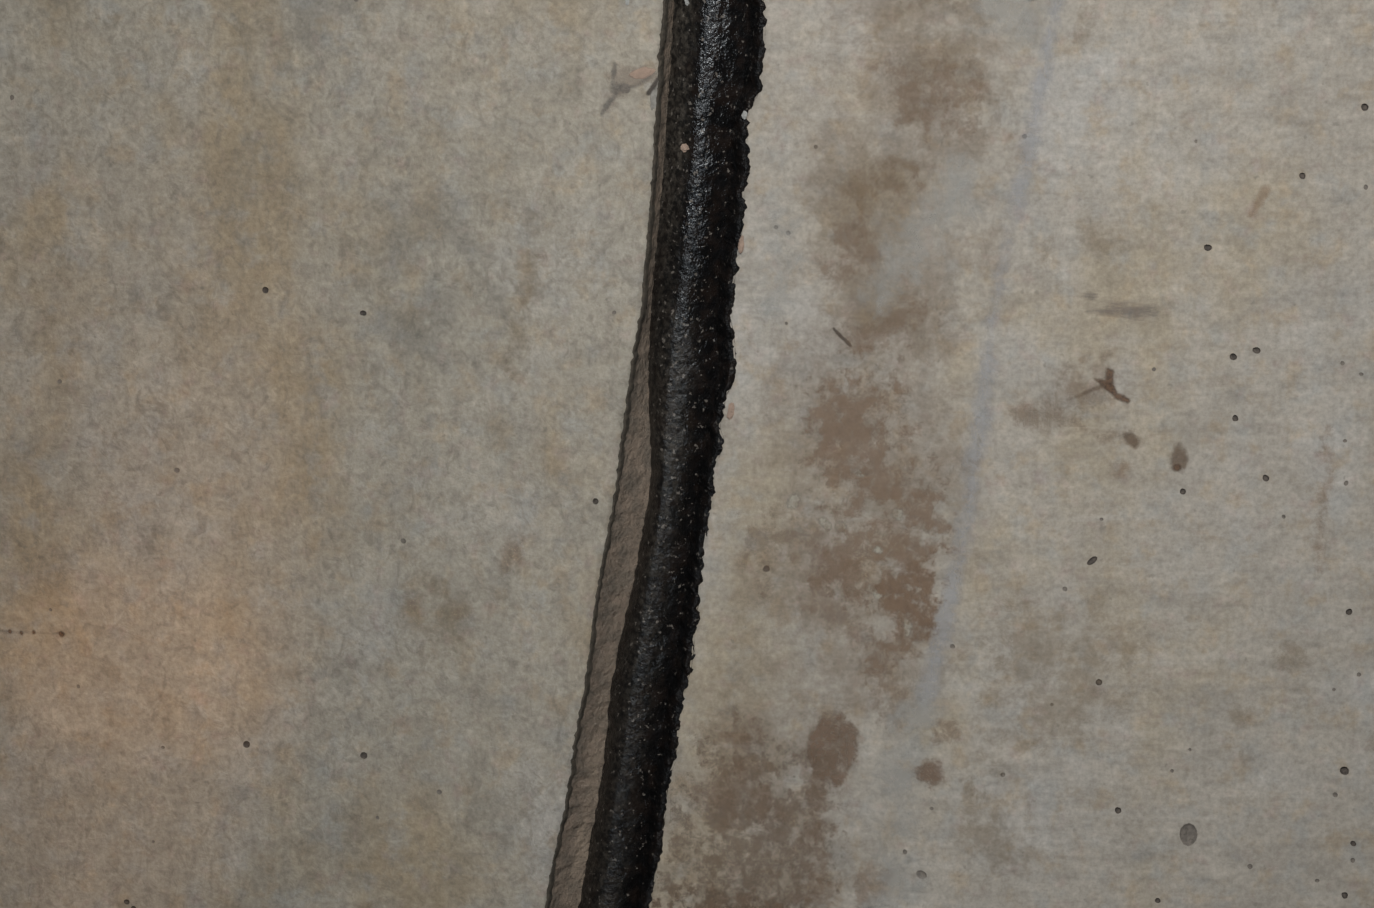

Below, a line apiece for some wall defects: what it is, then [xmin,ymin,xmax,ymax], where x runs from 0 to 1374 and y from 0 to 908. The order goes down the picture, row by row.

crack [545,0,674,908]
leakage [808,713,857,787]
leakage [917,763,941,785]